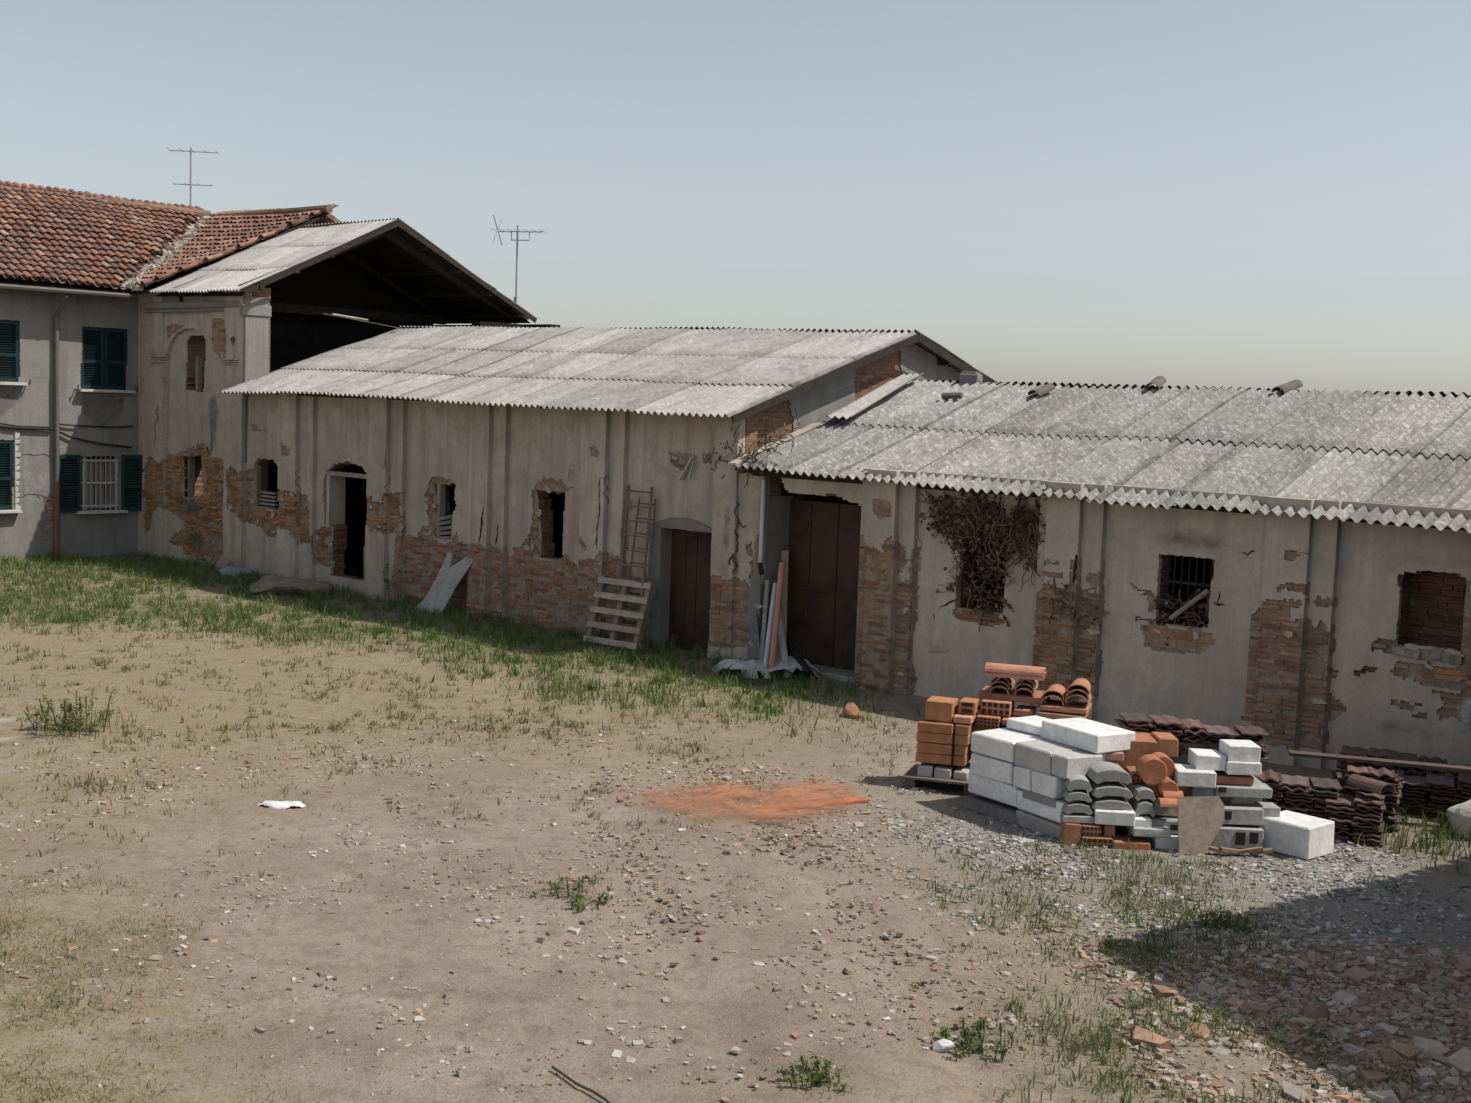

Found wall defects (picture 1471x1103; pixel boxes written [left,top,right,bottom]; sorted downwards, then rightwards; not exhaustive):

flaking render [142,444,334,567]
flaking render [366,477,648,642]
flaking render [872,499,892,519]
flaking render [854,534,922,695]
flaking render [1030,557,1110,708]
flaking render [1131,583,1215,655]
flaking render [1285,550,1308,561]
flaking render [1239,581,1471,753]